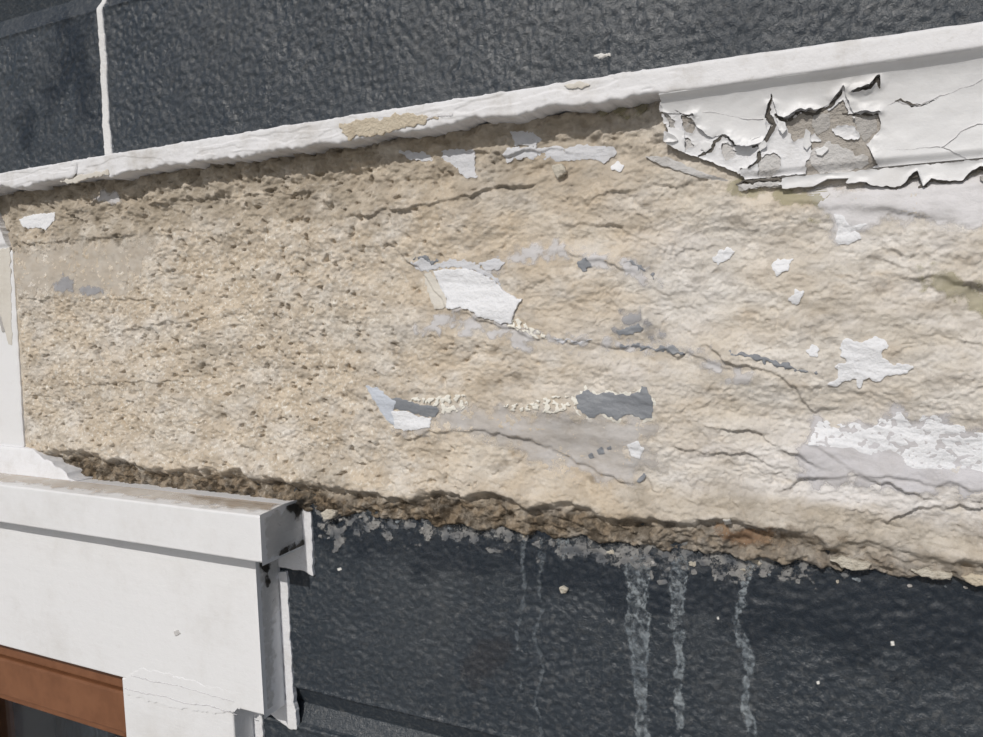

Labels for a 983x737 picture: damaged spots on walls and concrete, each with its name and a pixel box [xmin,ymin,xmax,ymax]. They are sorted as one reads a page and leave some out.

crack [680,77,983,190]
spalling [0,100,983,586]
damp [515,537,546,733]
damp [624,555,651,737]
damp [668,556,688,737]
damp [734,558,757,734]